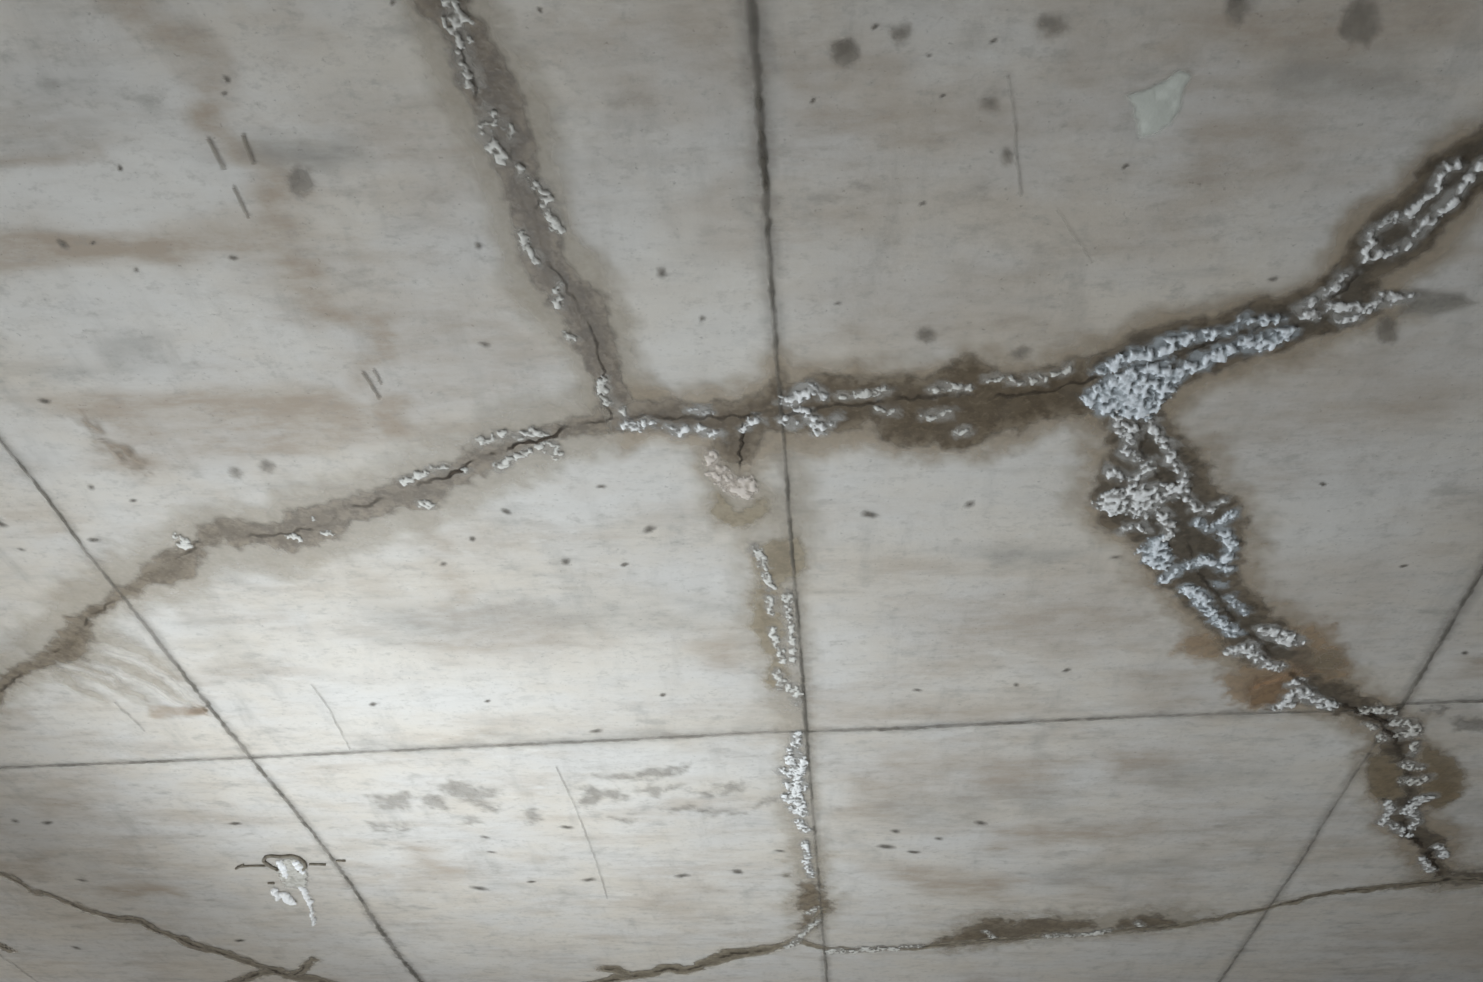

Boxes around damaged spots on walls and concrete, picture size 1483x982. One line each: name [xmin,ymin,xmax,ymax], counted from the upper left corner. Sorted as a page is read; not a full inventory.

damp [1340,0,1375,42]
damp [832,41,857,66]
crack [1330,275,1358,299]
damp [0,0,653,705]
crack [1144,341,1217,366]
crack [434,428,563,480]
crack [737,425,745,465]
damp [611,126,1483,880]
damp [582,768,677,804]
damp [774,731,832,949]
crack [592,704,1483,982]
crack [0,873,335,982]